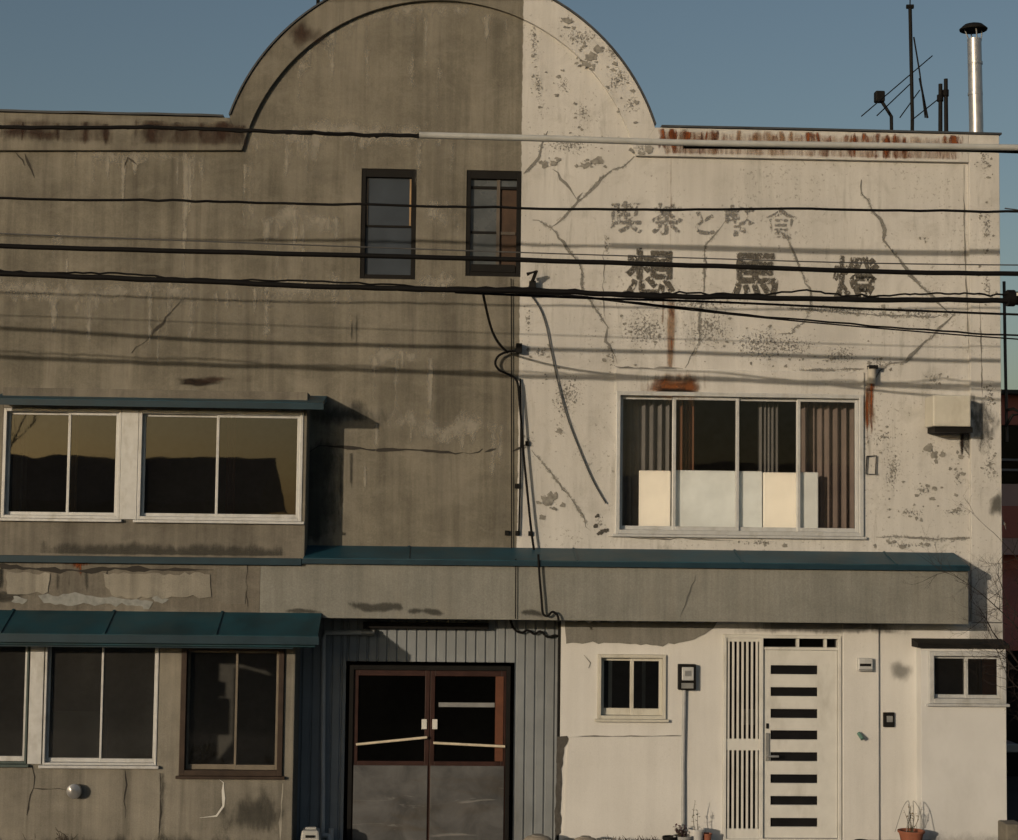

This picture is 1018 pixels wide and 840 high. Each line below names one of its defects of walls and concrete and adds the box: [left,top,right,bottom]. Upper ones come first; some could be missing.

peeling [530,15,639,124]
peeling [539,102,609,169]
rust [659,129,719,154]
rust [845,133,909,158]
crack [523,131,724,369]
crack [776,180,983,394]
crack [131,299,182,353]
rust [652,302,696,392]
rust [864,384,874,429]
crack [310,445,733,541]
crack [879,534,970,542]
spalling [6,565,247,609]